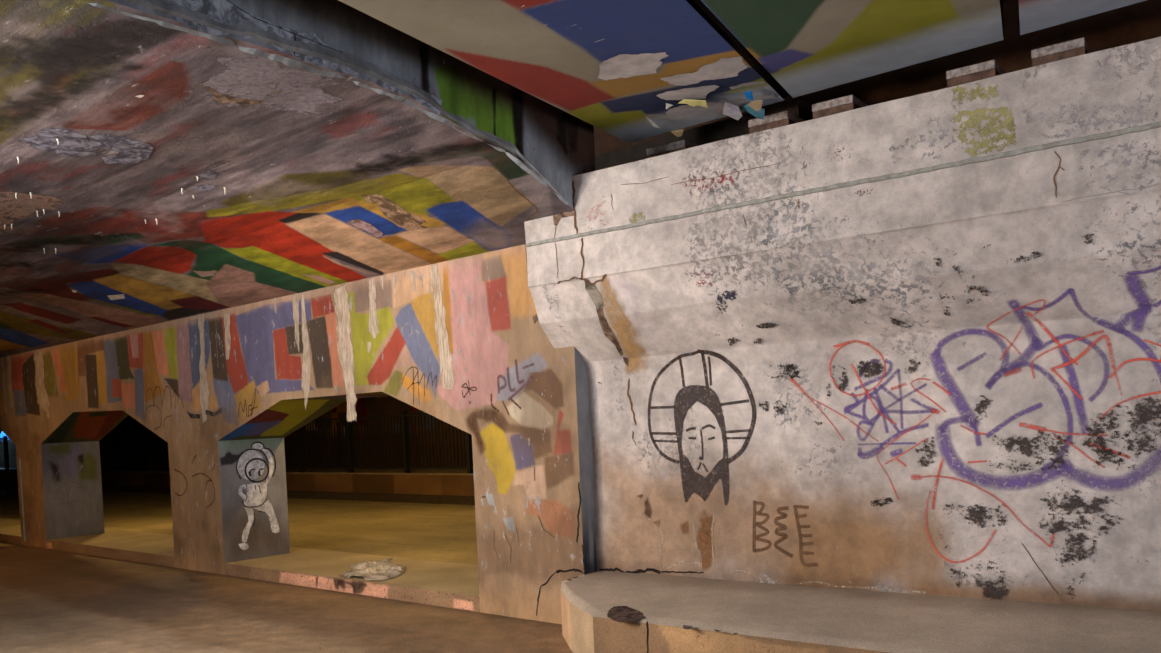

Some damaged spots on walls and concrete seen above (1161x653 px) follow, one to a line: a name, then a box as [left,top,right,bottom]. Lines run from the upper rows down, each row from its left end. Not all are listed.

peeling [598,52,777,122]
spalling [89,0,574,230]
spalling [18,128,153,165]
peeling [0,191,70,235]
spalling [347,219,383,237]
spalling [187,407,223,419]
crack [494,482,704,616]